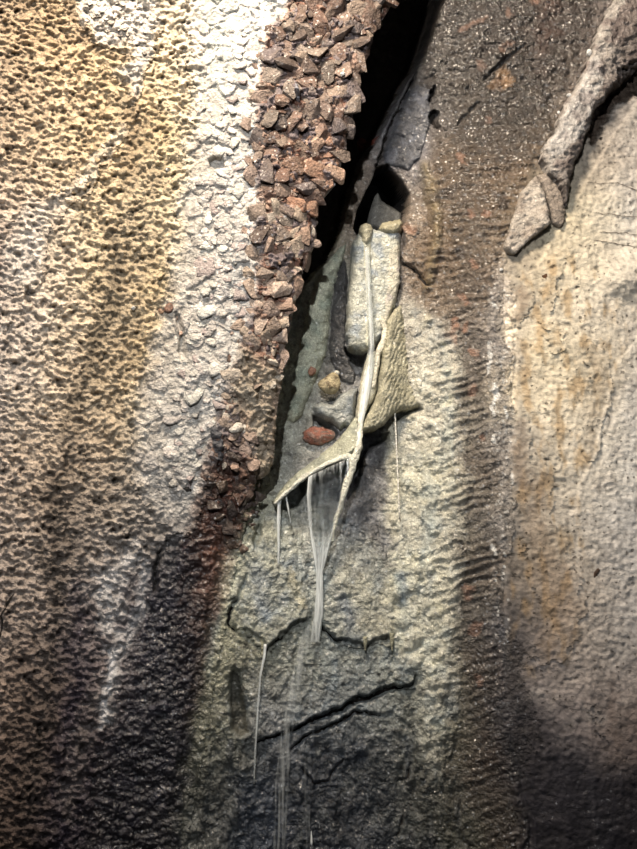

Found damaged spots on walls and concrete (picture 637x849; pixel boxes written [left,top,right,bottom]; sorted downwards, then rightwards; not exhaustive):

flaking render [122,0,399,561]
crack [302,0,434,286]
crack [429,88,437,129]
damp [229,0,637,849]
rust [181,432,257,720]
crack [302,758,344,785]
crack [256,686,403,750]